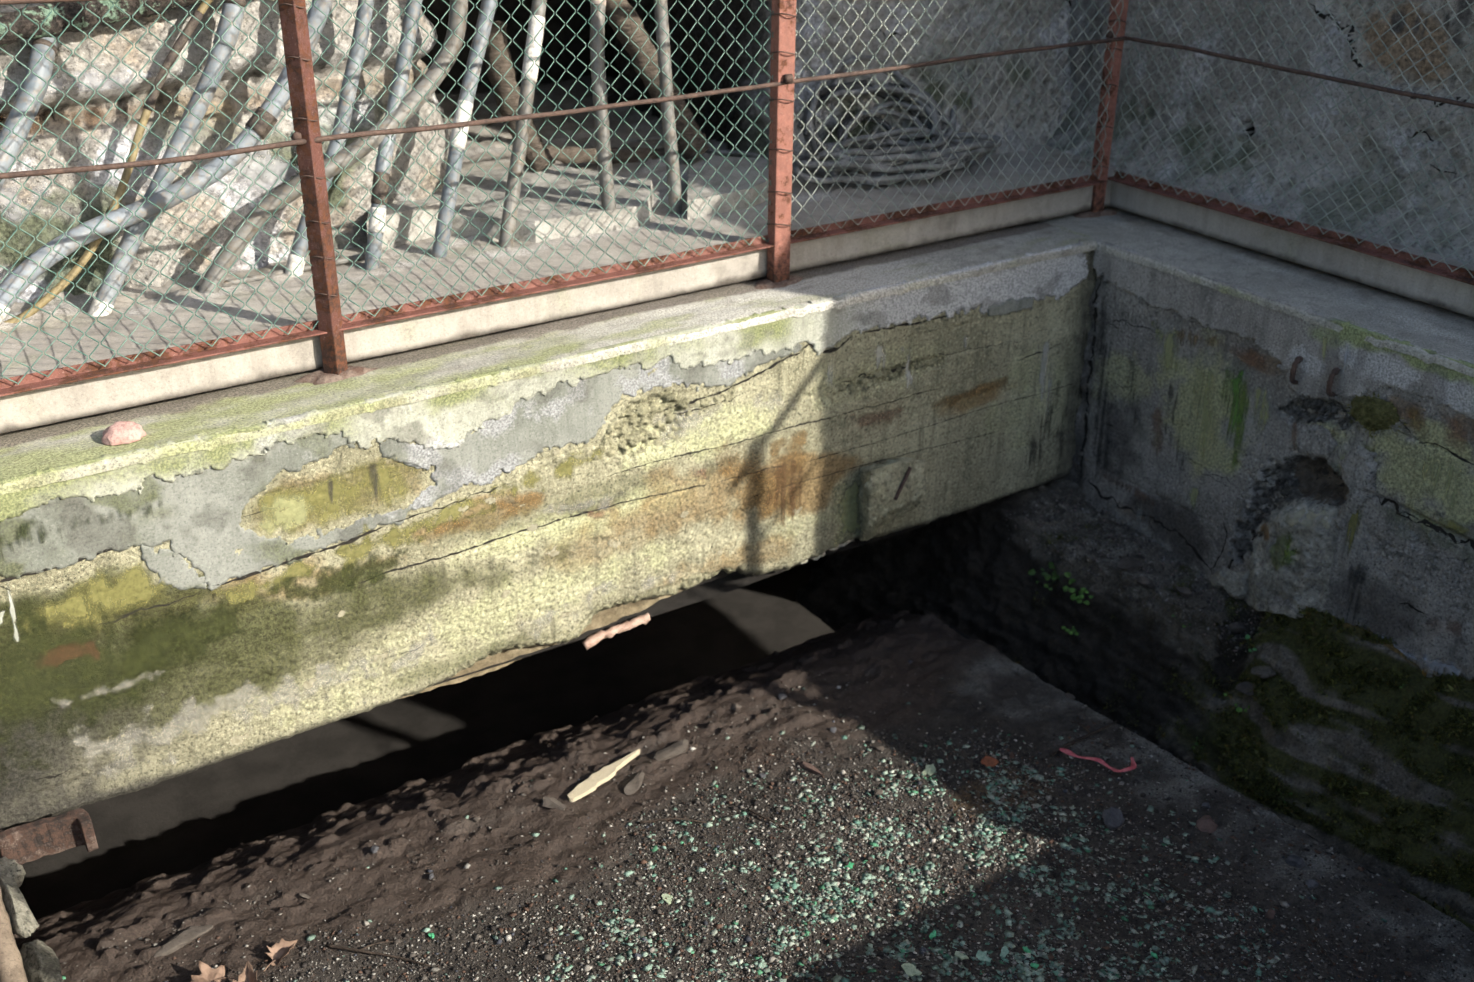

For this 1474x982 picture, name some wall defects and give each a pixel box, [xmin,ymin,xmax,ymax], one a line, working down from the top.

peeling [0,240,1474,600]
corrosion [722,431,807,514]
damp [1157,330,1268,466]
crack [1399,420,1474,465]
damp [0,523,46,557]
crack [1376,495,1474,549]
damp [0,591,19,641]
spalling [453,549,736,677]
damp [1342,566,1462,678]